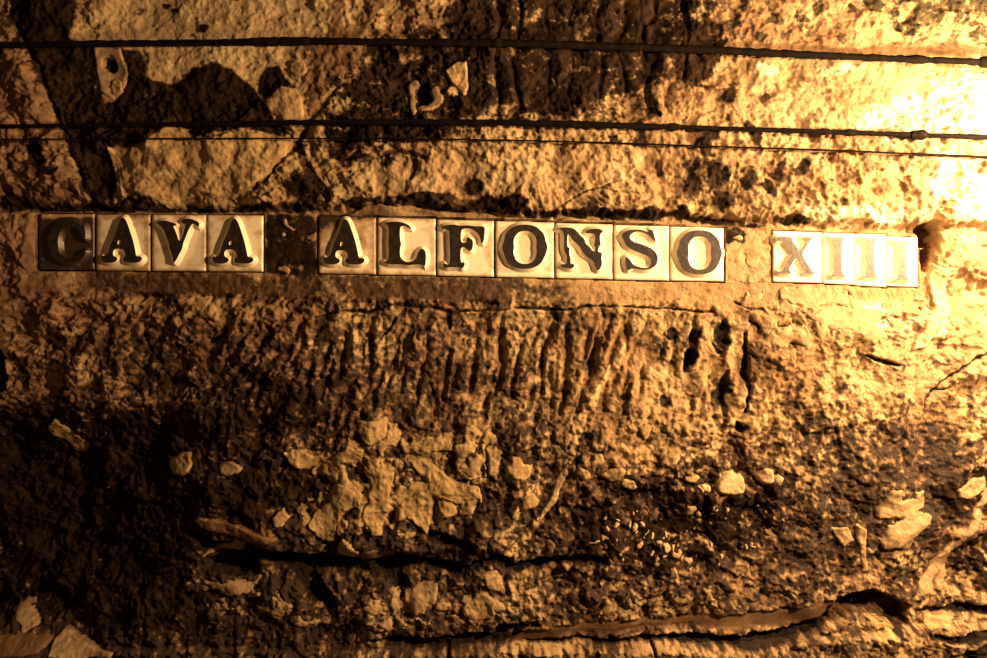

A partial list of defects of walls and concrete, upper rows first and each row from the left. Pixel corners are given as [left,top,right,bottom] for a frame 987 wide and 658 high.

crack [922,352,987,415]
crack [193,530,827,658]